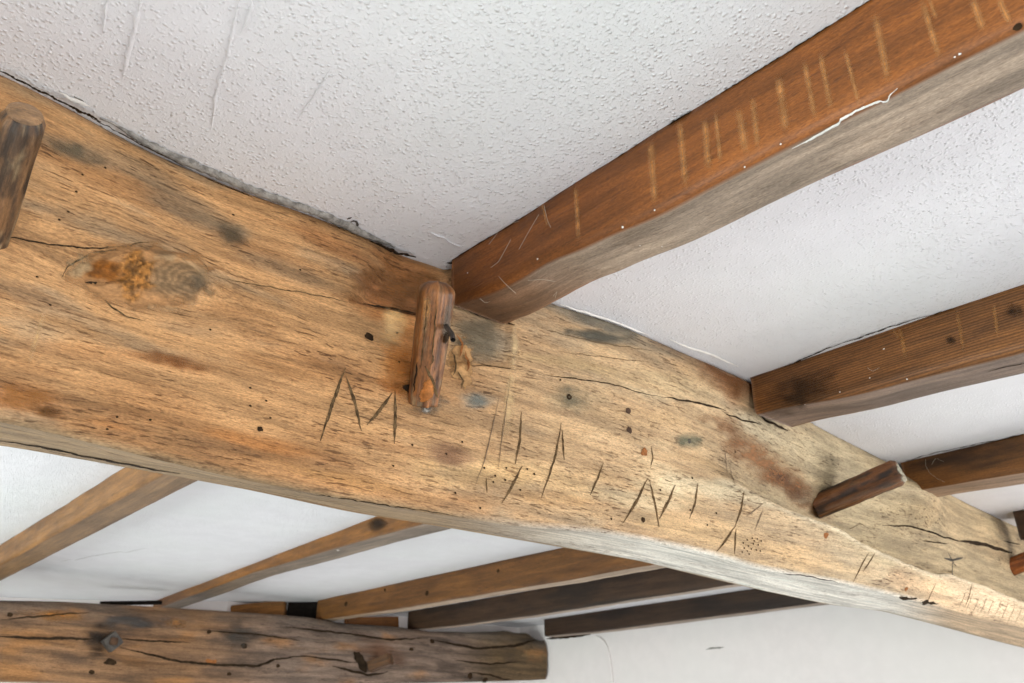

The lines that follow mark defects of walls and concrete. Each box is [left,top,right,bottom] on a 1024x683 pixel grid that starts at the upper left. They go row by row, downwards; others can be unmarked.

crack [475,329,761,425]
crack [846,523,1019,575]